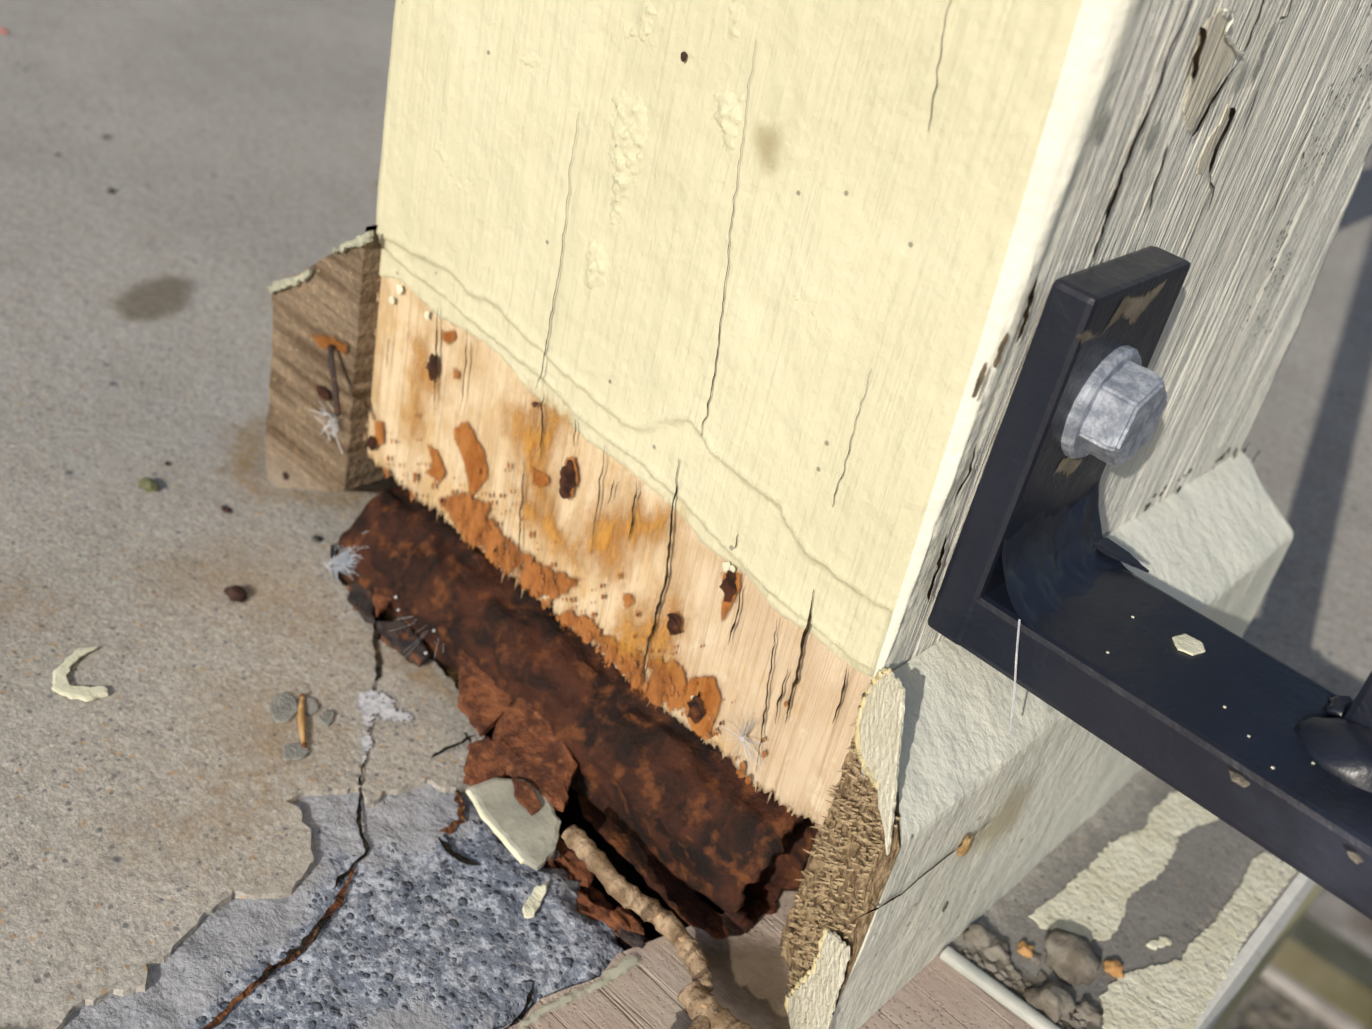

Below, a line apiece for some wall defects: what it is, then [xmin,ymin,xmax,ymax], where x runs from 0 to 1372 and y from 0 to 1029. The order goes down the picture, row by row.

peeling [1183,8,1246,133]
damp [116,278,190,319]
spalling [62,778,624,1029]
crack [334,616,382,889]
rust [347,582,430,668]
rust [367,330,733,740]
rust [440,656,745,940]
crack [639,459,679,686]
rust [719,570,741,620]
crack [755,590,814,772]
peeling [1029,791,1218,942]
peeling [1100,852,1296,1029]